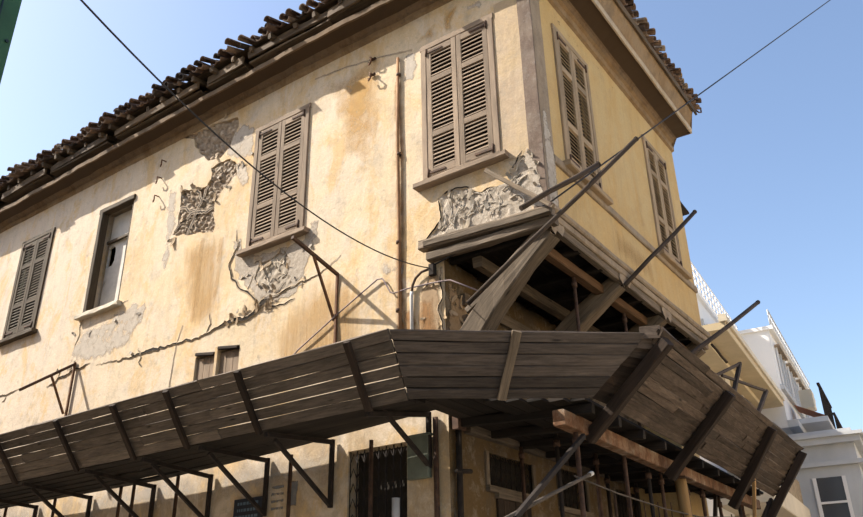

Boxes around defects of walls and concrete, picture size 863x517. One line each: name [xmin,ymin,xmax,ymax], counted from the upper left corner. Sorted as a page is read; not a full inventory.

spalling [162,114,254,269]
peeling [426,110,558,239]
peeling [67,303,146,371]
crack [46,230,341,388]
peeling [233,221,318,303]